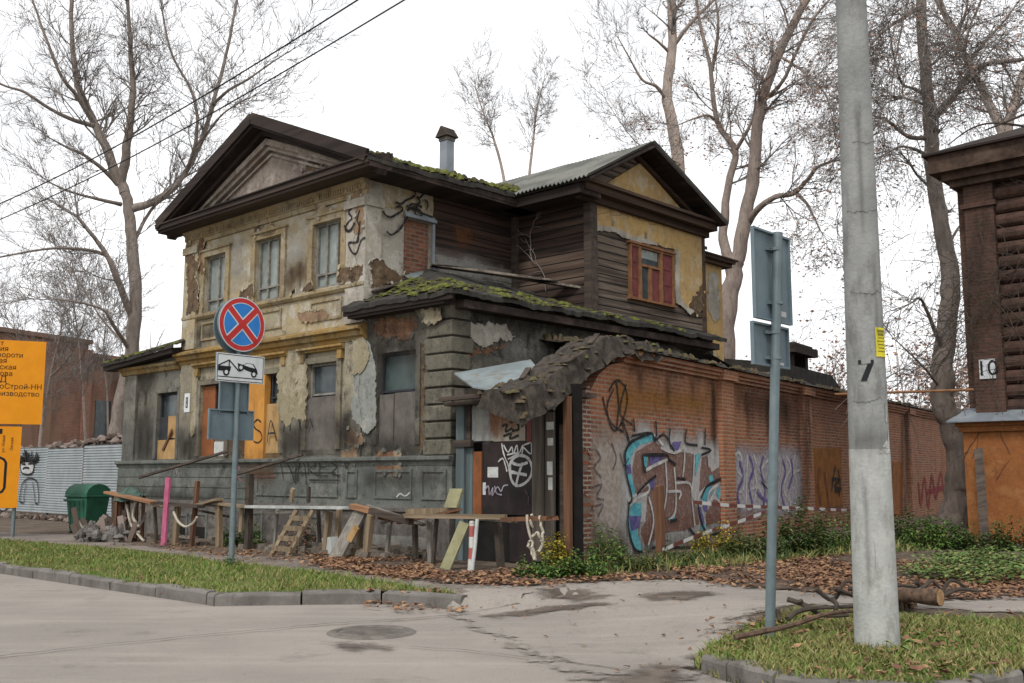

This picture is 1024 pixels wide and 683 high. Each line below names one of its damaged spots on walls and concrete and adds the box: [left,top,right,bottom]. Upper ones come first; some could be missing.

flaking render [597,225,658,246]
flaking render [185,238,205,316]
flaking render [297,306,328,324]
flaking render [337,257,410,289]
flaking render [466,321,515,358]
flaking render [675,250,720,322]
flaking render [276,351,309,427]
flaking render [341,307,442,467]